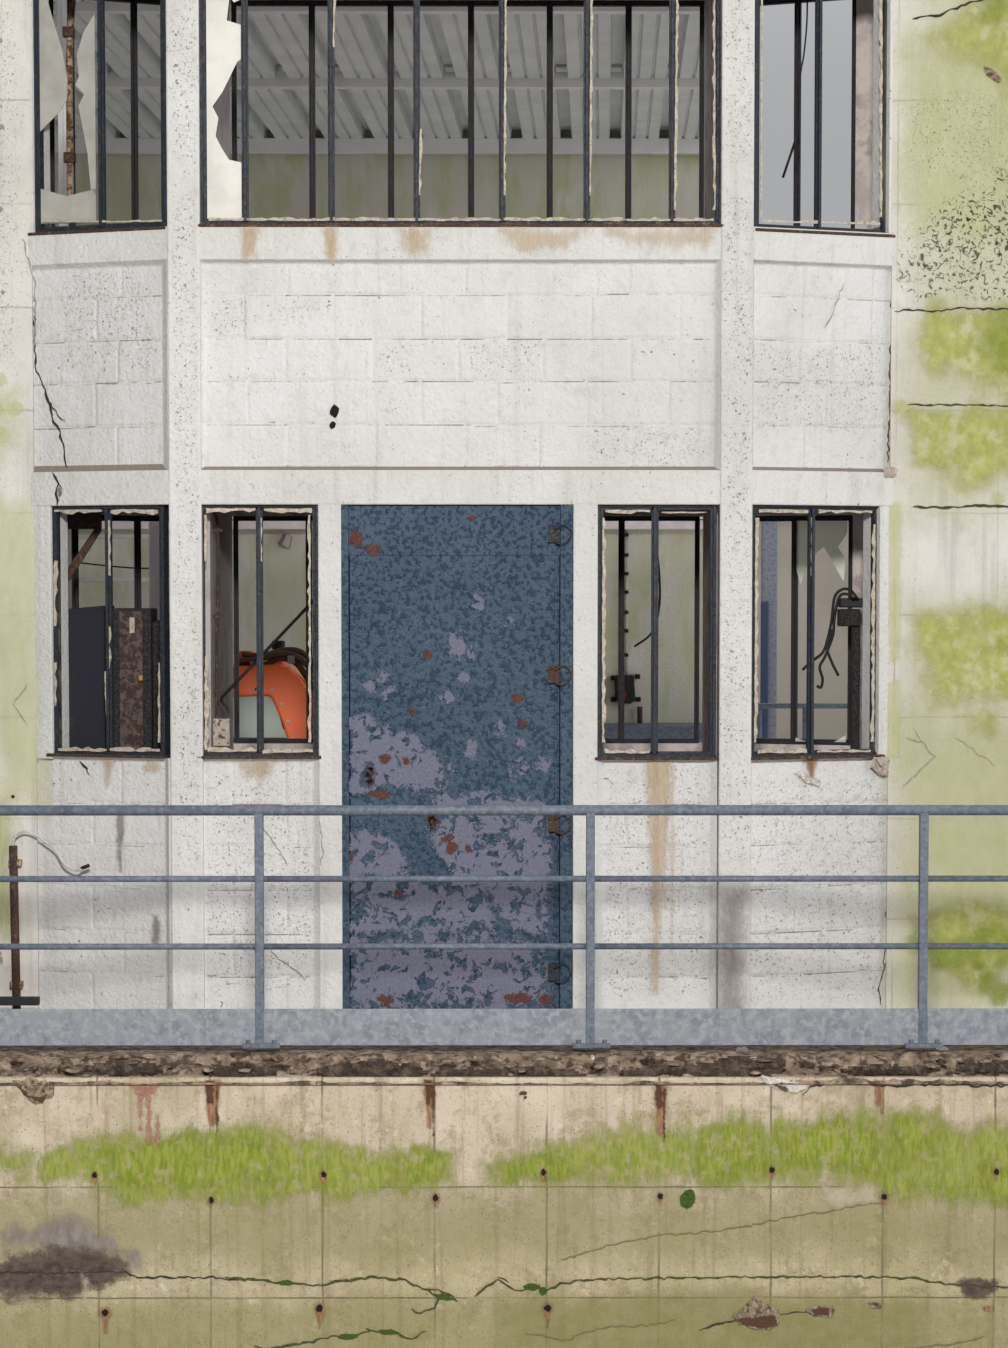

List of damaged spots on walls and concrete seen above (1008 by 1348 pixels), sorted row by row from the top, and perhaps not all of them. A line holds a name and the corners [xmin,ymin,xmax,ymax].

crack [913,0,983,19]
crack [23,239,67,505]
peeling [471,593,485,611]
peeling [359,668,403,701]
peeling [438,629,480,704]
peeling [349,712,555,1009]
rust [649,762,669,926]
rust [205,1080,221,1131]
leakage [822,1170,874,1207]
leakage [0,1217,140,1302]
crack [0,1202,1008,1348]